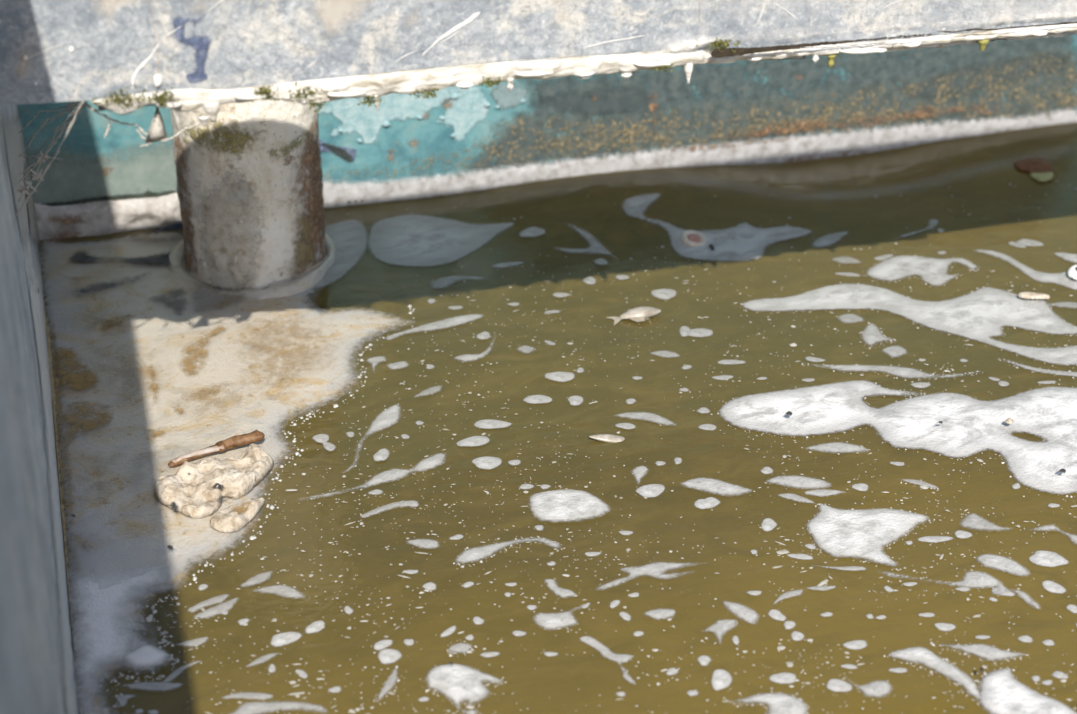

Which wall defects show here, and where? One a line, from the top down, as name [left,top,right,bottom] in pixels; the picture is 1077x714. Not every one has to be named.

peeling [317,82,528,144]
damp [91,0,1077,126]
corrosion [285,121,326,275]